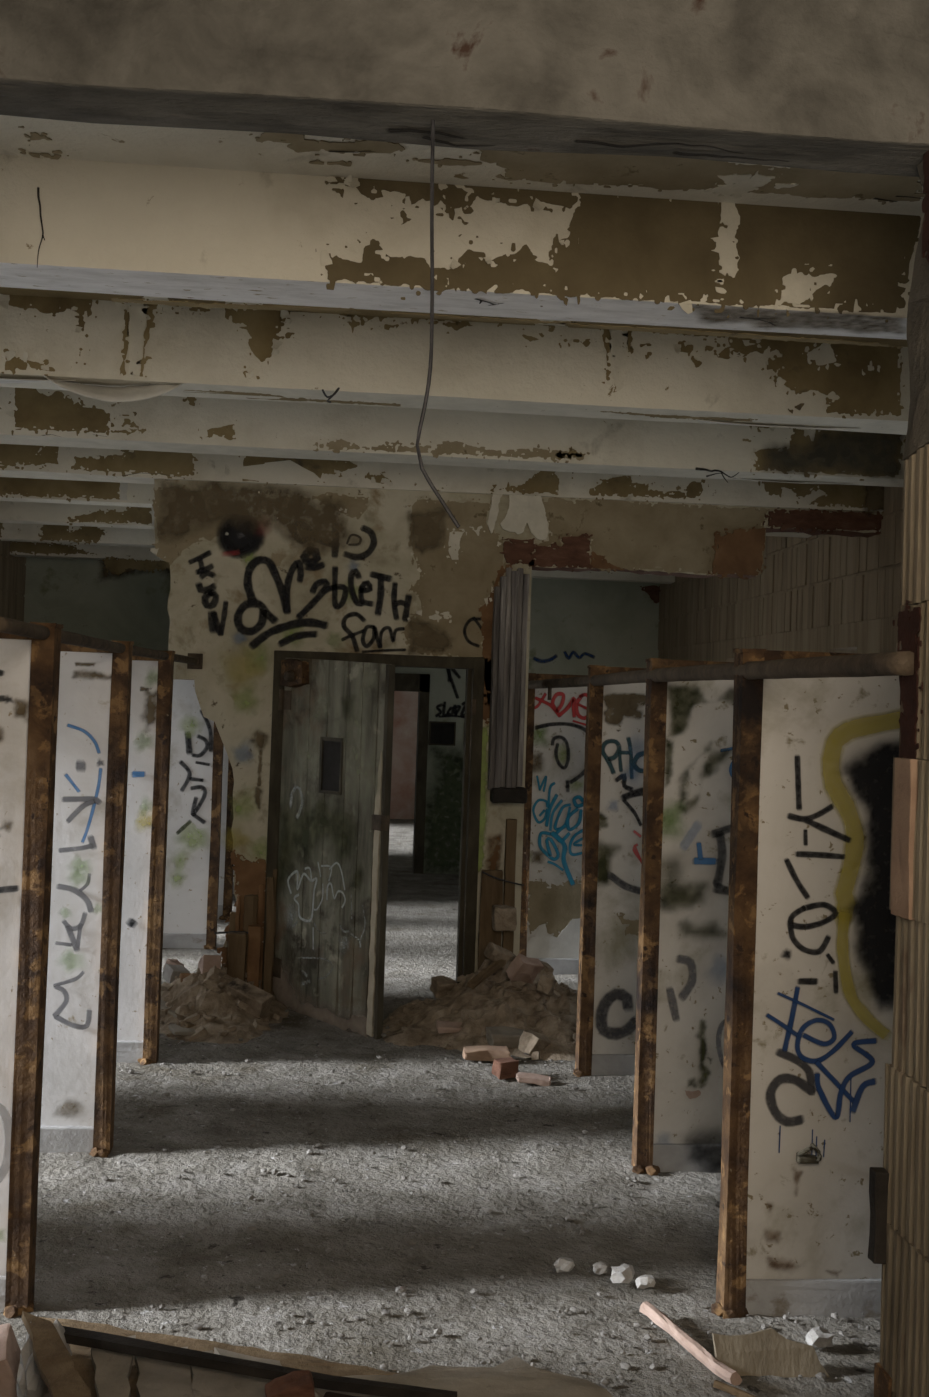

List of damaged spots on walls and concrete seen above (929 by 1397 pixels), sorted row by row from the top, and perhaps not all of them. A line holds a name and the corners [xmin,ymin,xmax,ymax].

peeling [18,126,69,160]
peeling [0,132,929,725]
peeling [603,693,646,732]
peeling [665,687,729,812]
spalling [893,600,923,759]